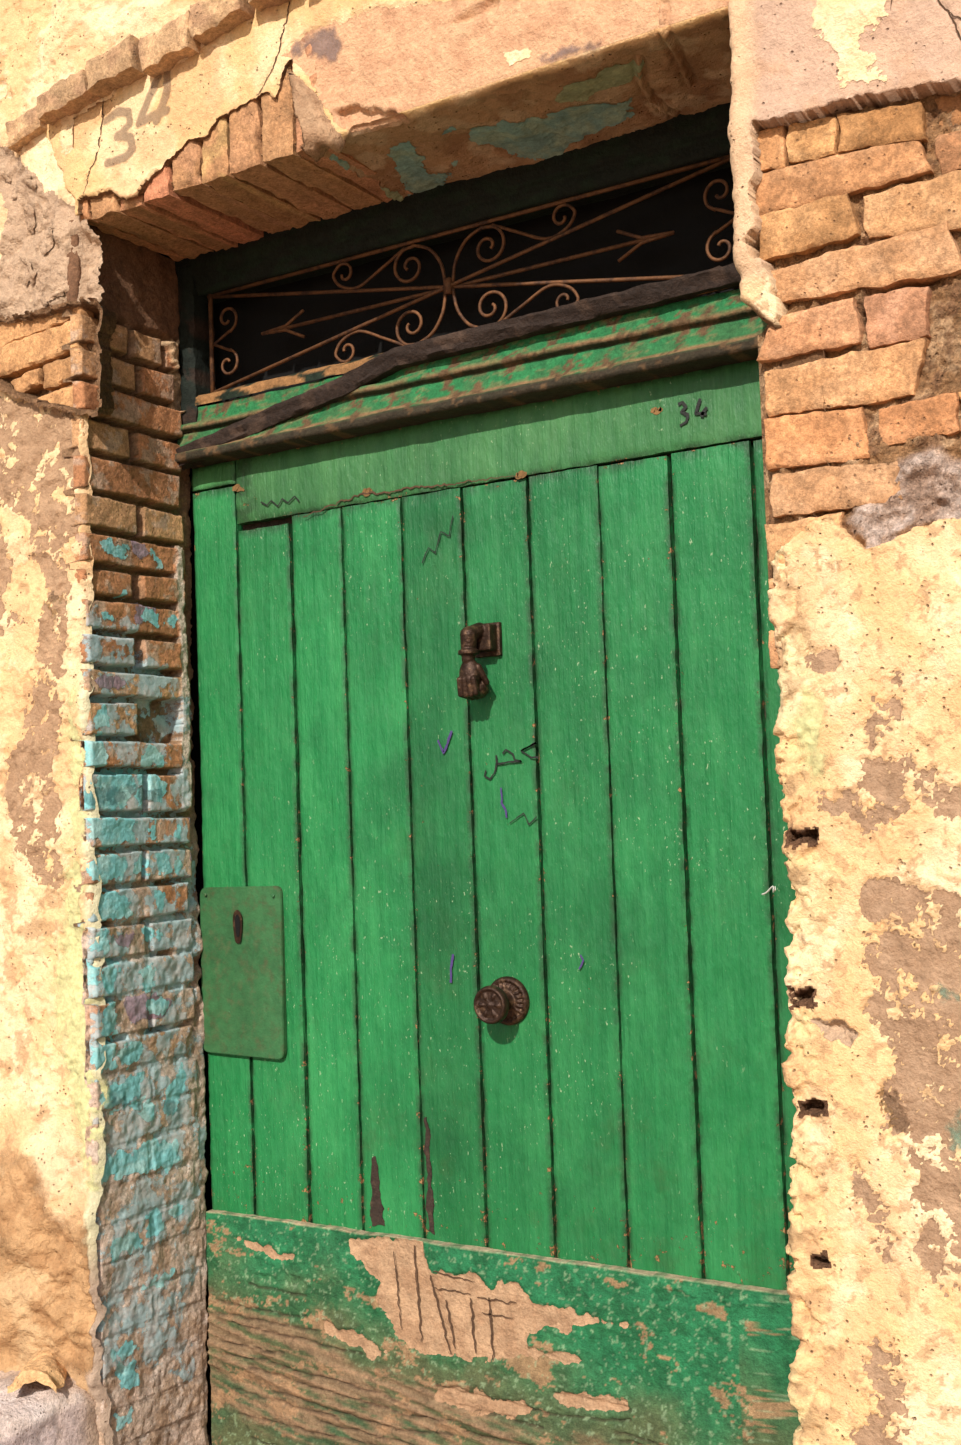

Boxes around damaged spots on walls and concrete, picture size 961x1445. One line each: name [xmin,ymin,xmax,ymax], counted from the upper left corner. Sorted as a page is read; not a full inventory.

crack [257,1,290,95]
crack [938,0,961,40]
spalling [755,91,961,609]
peeling [0,0,729,1431]
spalling [768,630,781,669]
peeling [804,648,841,676]
peeling [784,671,961,849]
peeling [786,876,961,1297]